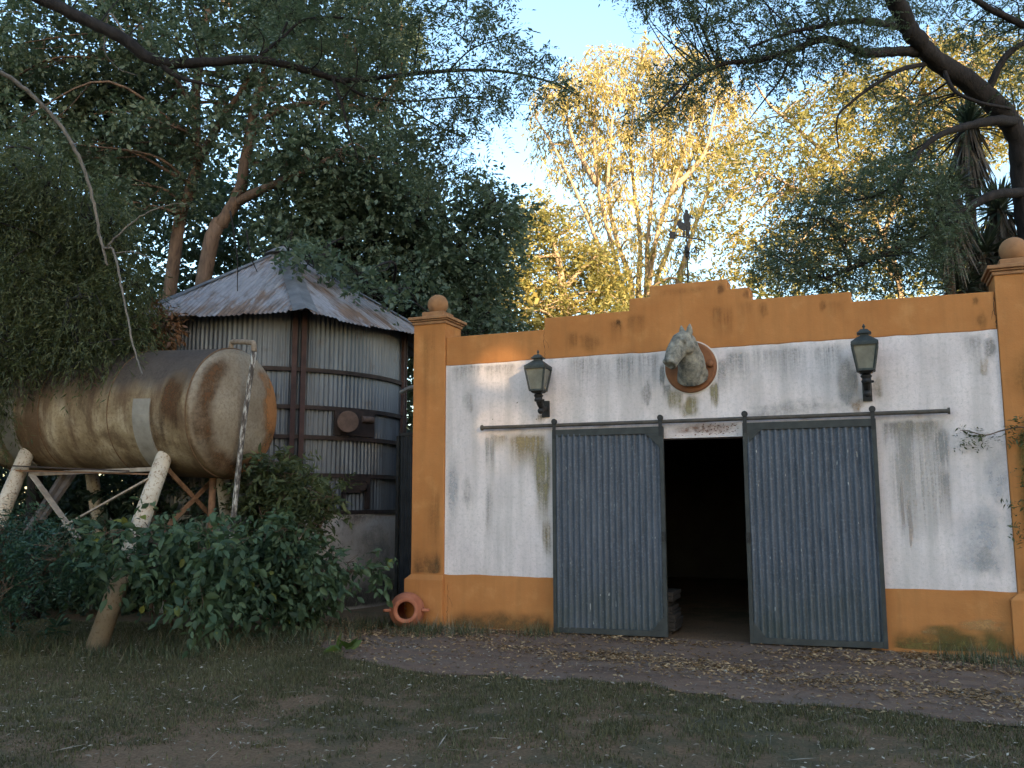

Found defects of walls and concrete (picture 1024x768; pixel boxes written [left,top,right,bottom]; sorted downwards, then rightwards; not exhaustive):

leakage [486,436,550,505]
leakage [884,421,949,509]